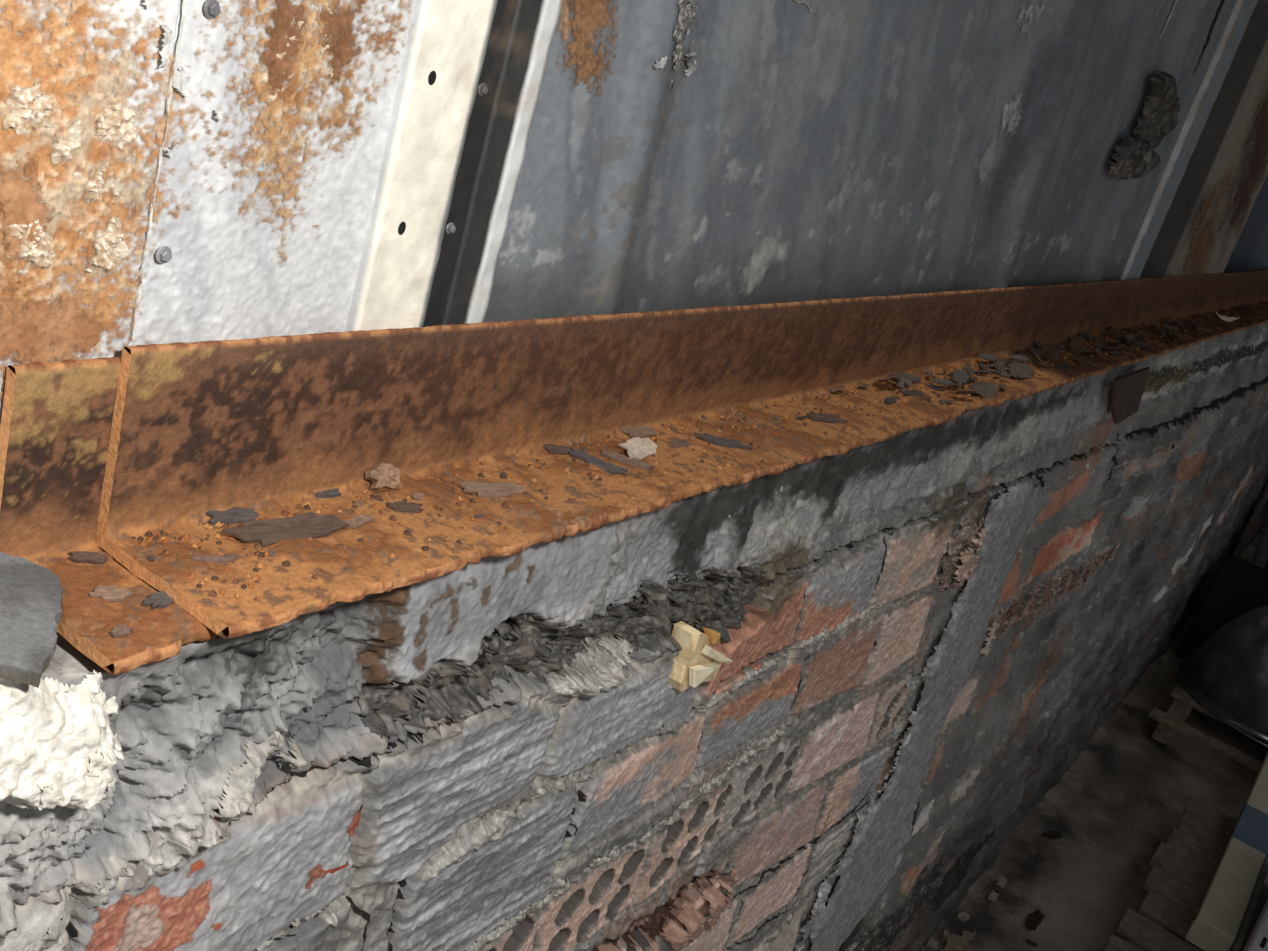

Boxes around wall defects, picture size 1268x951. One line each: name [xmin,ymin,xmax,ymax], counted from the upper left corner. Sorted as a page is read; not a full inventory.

corrosion [557,0,618,96]
peeling [652,0,700,92]
corrosion [0,0,412,397]
corrosion [884,349,1070,405]
corrosion [621,420,753,449]
crack [992,376,1268,489]
corrosion [365,463,424,513]
corrosion [88,585,174,610]
corrosion [357,579,491,684]
spalling [358,565,775,739]
peeling [85,860,222,951]
spalling [593,868,740,951]